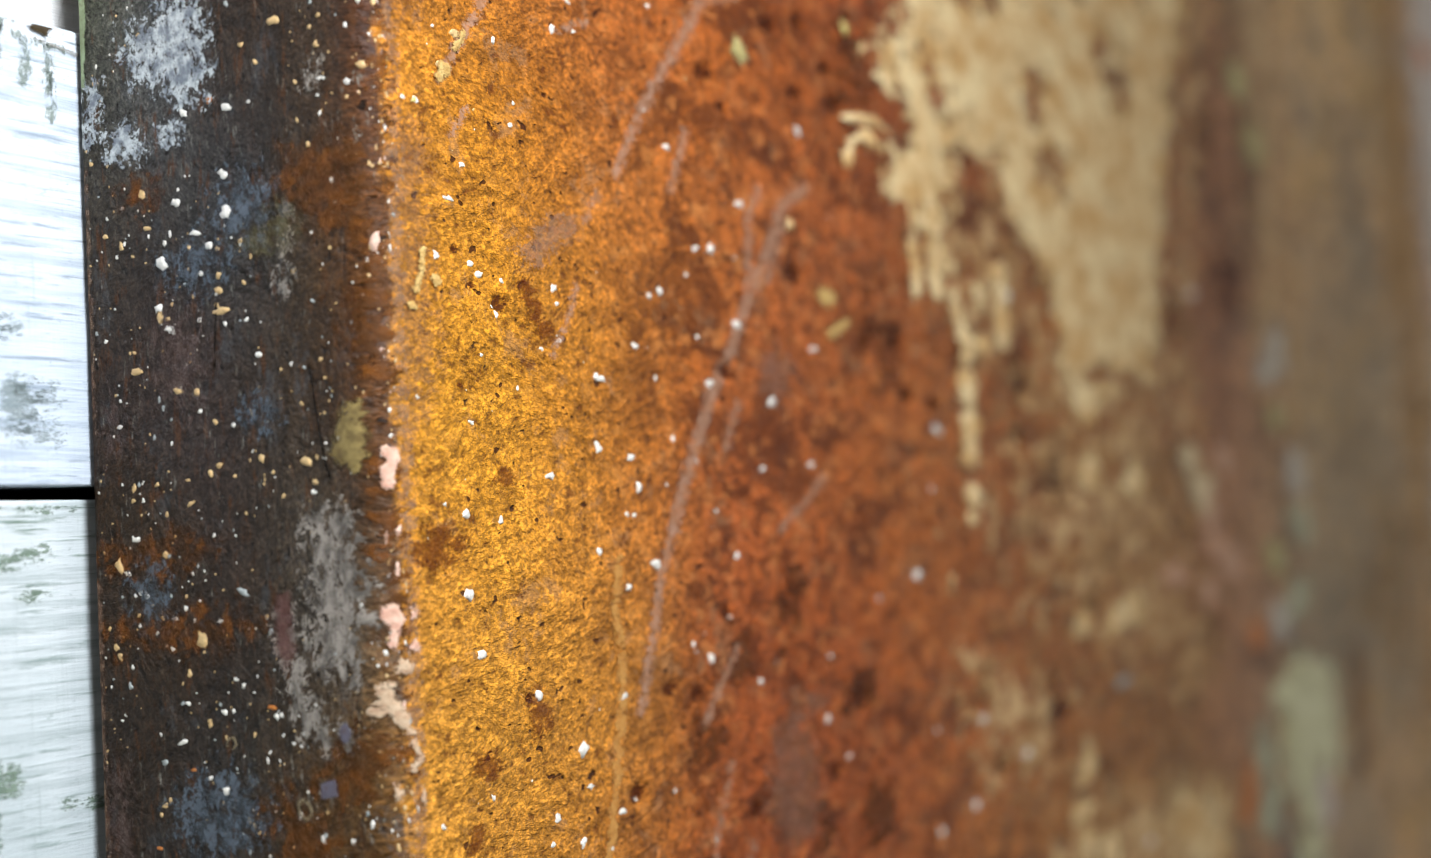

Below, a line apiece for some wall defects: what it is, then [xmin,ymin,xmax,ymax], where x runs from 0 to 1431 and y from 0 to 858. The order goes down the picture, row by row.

peeling [731,38,748,64]
corrosion [257,5,403,390]
peeling [815,0,1191,526]
corrosion [517,278,555,339]
corrosion [494,466,517,494]
corrosion [96,520,222,591]
spalling [1162,440,1246,610]
corrosion [98,597,273,663]
corrosion [252,446,474,858]
corrosion [528,685,554,743]
corrosion [470,747,503,781]
corrosion [465,823,489,857]